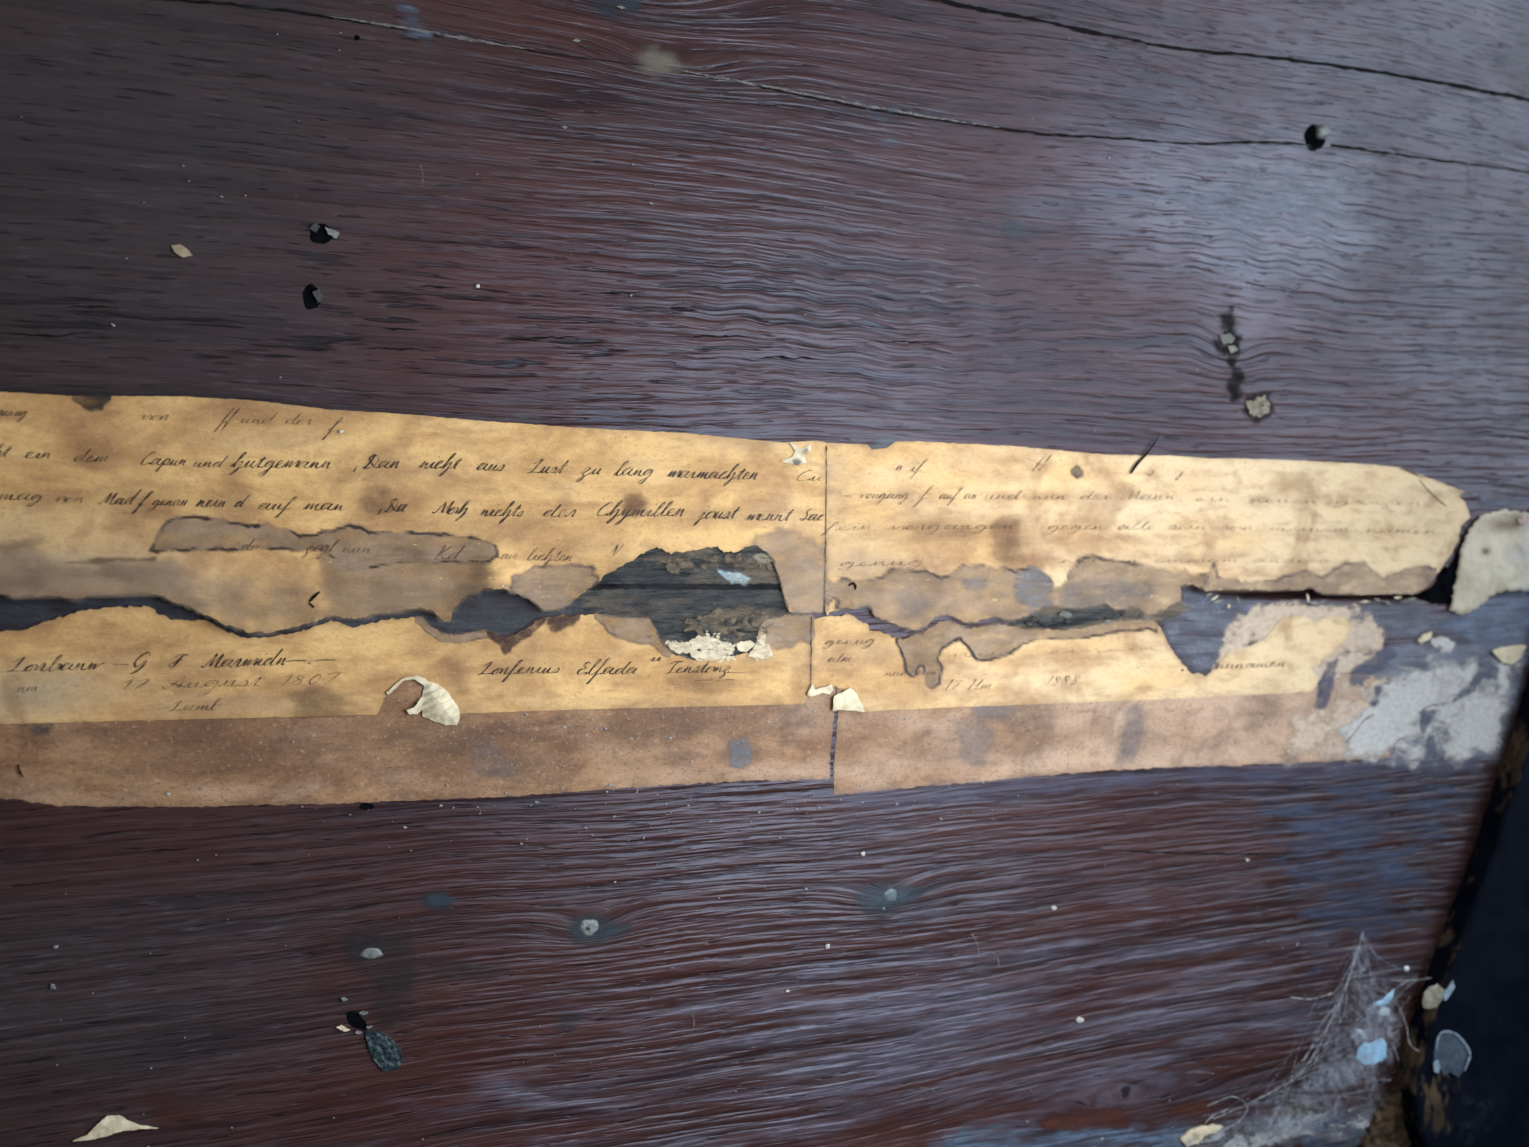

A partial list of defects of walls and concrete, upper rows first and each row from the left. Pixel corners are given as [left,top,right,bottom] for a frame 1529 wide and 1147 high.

crack [170,0,1529,173]
peeling [0,588,585,638]
peeling [1024,611,1076,626]